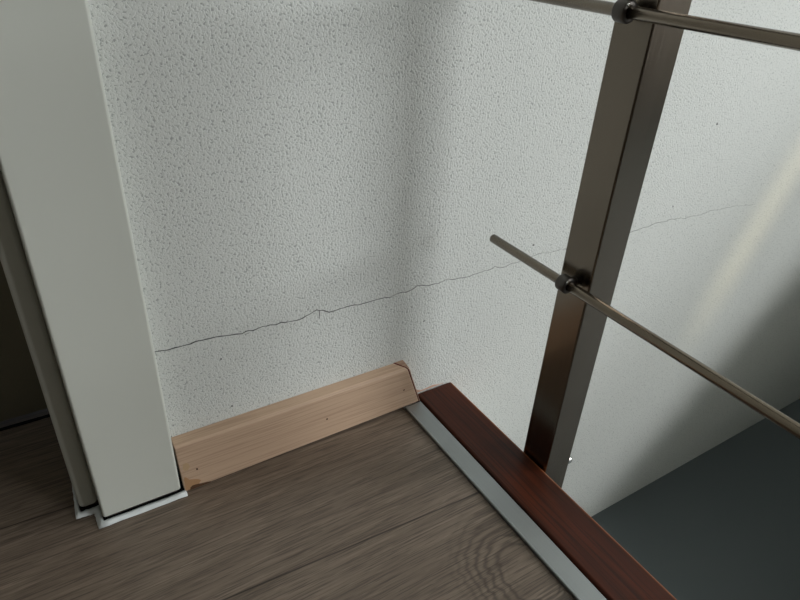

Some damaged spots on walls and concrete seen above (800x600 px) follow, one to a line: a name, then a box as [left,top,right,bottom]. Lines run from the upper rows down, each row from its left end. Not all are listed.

crack [155,249,564,352]